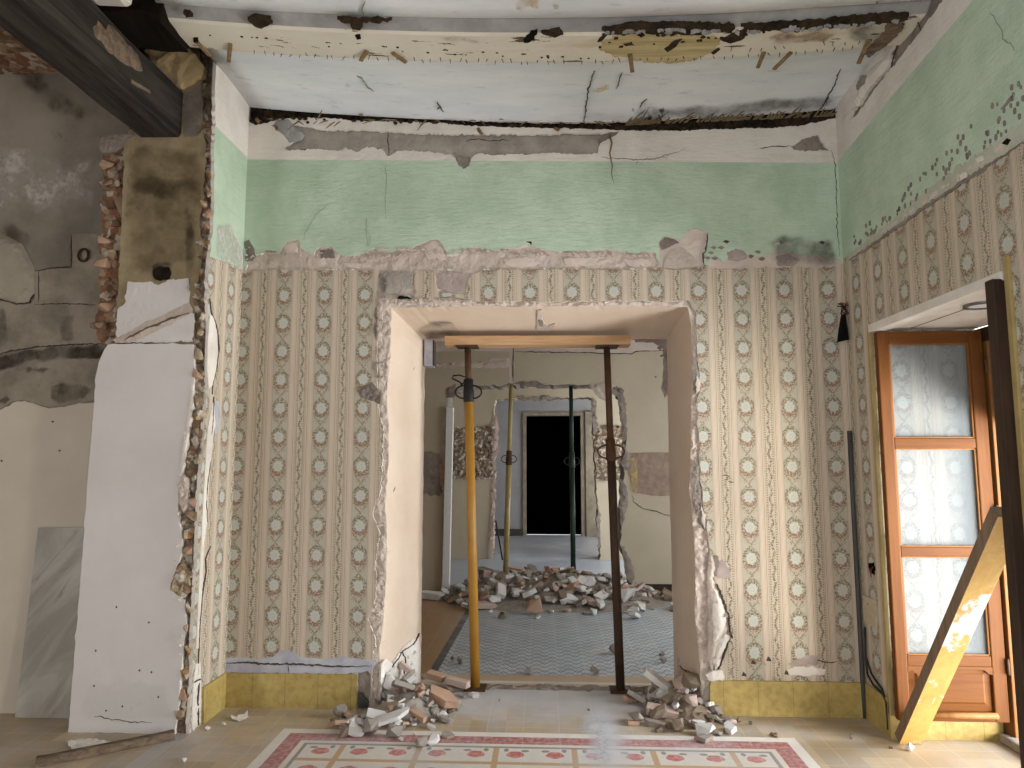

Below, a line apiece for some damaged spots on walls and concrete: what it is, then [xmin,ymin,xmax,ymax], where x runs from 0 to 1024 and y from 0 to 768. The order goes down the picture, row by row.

crack [584,71,595,120]
peeling [597,0,943,117]
crack [821,69,841,109]
crack [606,149,684,160]
crack [830,150,840,255]
peeling [0,358,100,409]
flaking render [170,81,221,733]
spalling [225,81,1024,708]